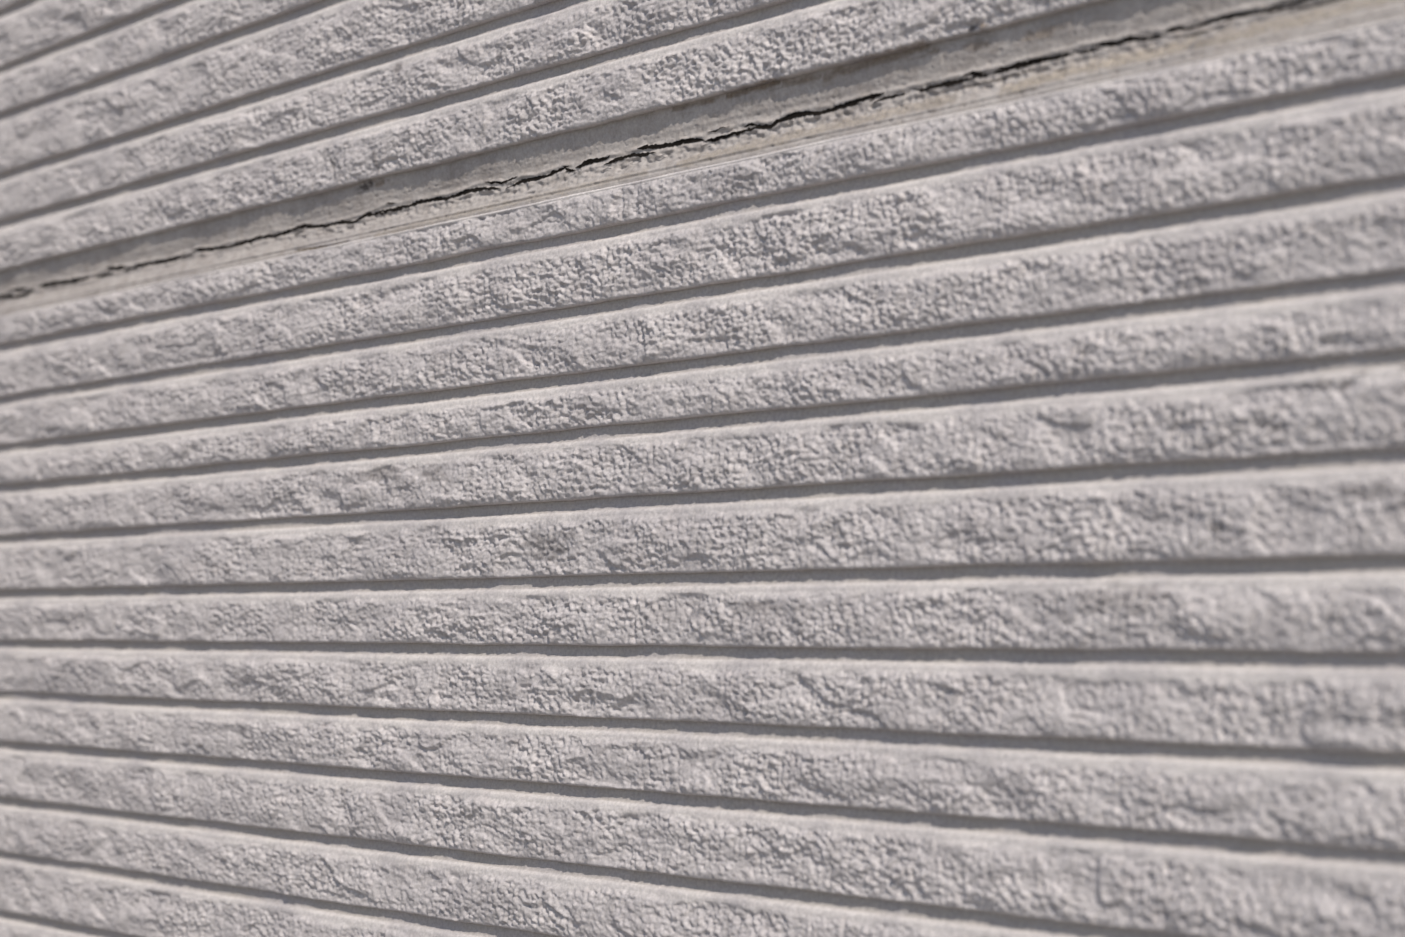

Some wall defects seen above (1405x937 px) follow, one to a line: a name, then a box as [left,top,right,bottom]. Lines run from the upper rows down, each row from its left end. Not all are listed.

crack [0,0,1336,299]